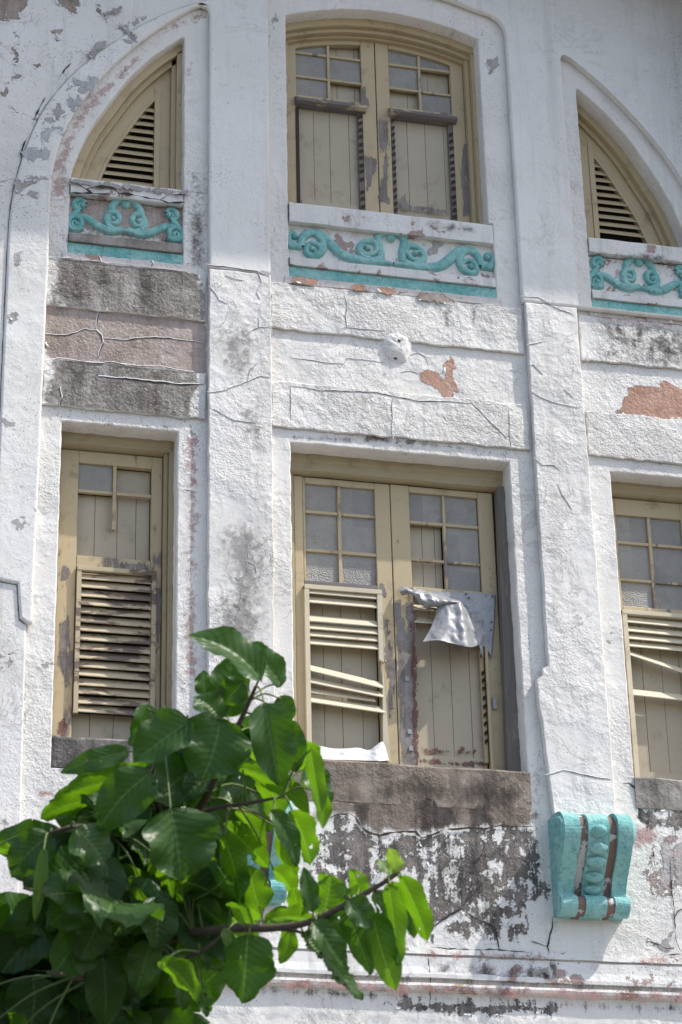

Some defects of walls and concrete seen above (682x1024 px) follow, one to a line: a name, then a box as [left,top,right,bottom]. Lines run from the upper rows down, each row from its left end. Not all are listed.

peeling [0,0,28,21]
peeling [56,0,80,15]
peeling [13,176,39,199]
spalling [20,60,182,242]
peeling [461,142,470,216]
damp [49,259,205,320]
crack [45,312,512,450]
peeling [420,356,459,397]
peeling [615,381,682,419]
spalling [310,813,551,944]
peeling [635,827,682,897]
peeling [384,997,558,1018]